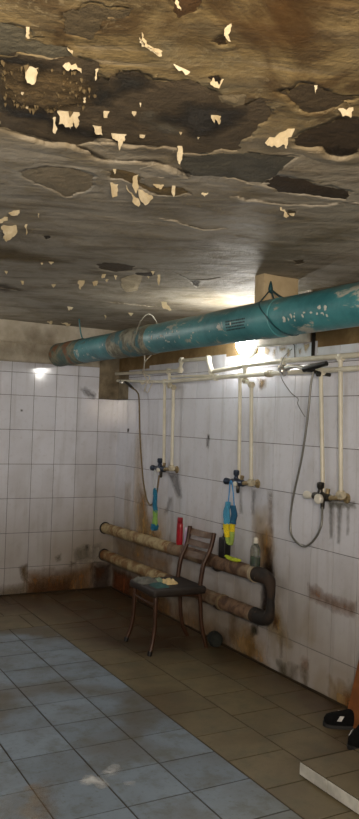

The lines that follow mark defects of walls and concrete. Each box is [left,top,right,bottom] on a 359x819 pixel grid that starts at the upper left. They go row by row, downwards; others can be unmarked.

spalling [0,0,359,207]
spalling [279,207,303,218]
spalling [78,261,160,289]
corrosion [0,564,211,635]